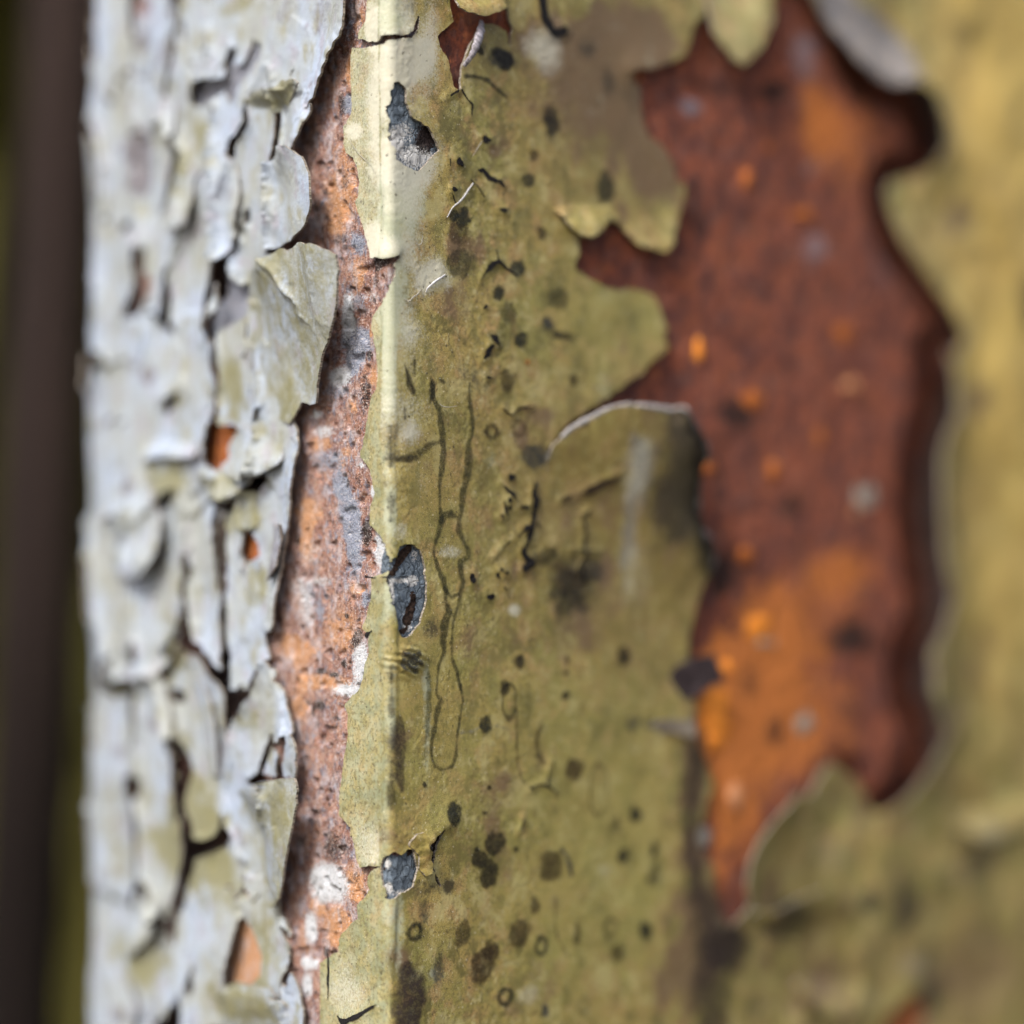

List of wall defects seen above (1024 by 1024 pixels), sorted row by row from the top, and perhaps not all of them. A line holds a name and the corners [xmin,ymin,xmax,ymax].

peeling [192,40,299,122]
peeling [387,82,437,171]
peeling [107,471,162,577]
crack [157,485,253,677]
peeling [139,274,285,603]
corrosion [238,0,418,1024]
leakage [426,379,499,770]
corrosion [546,0,955,925]
crack [175,739,193,840]
crack [249,736,308,794]
leakage [447,802,461,827]
leakage [472,832,518,888]